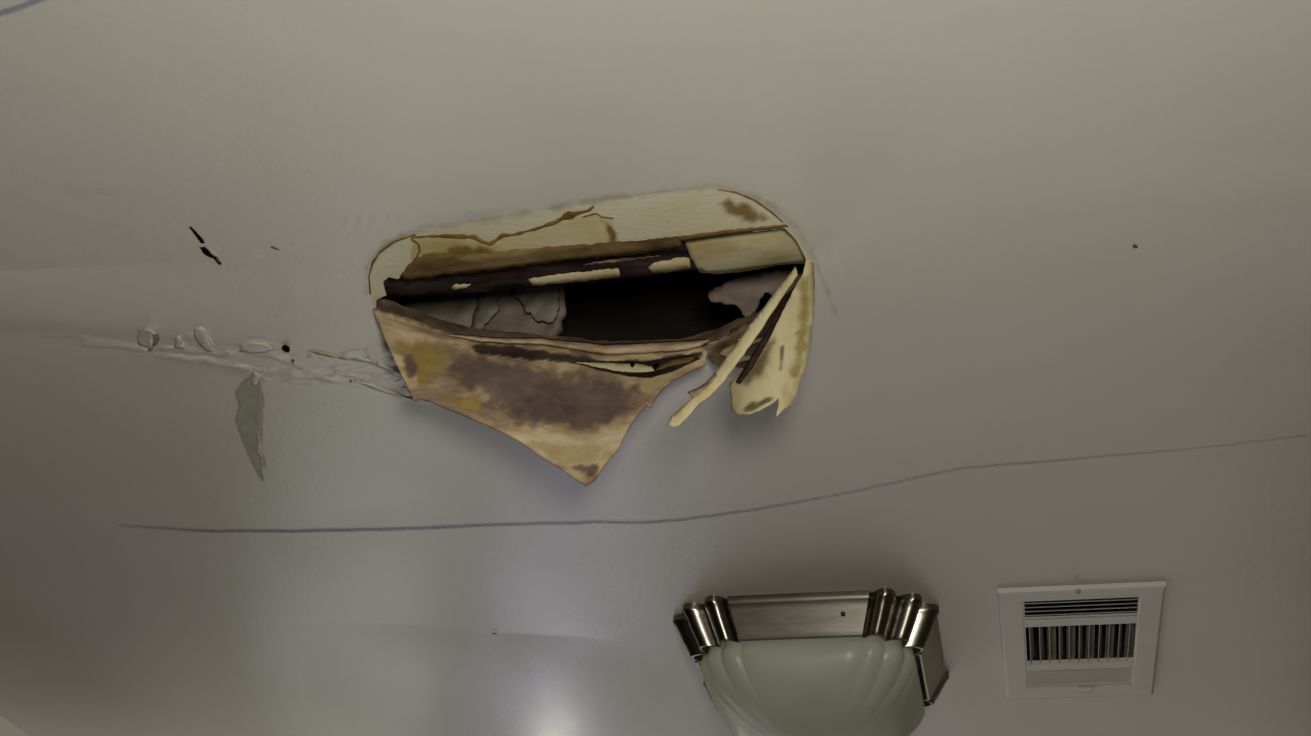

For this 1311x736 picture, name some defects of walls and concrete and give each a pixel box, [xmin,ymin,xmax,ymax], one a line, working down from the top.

crack [189,226,222,265]
peeling [368,189,810,344]
peeling [137,327,213,352]
damp [745,280,808,383]
damp [401,344,702,427]
damp [745,398,771,411]
damp [540,444,599,476]